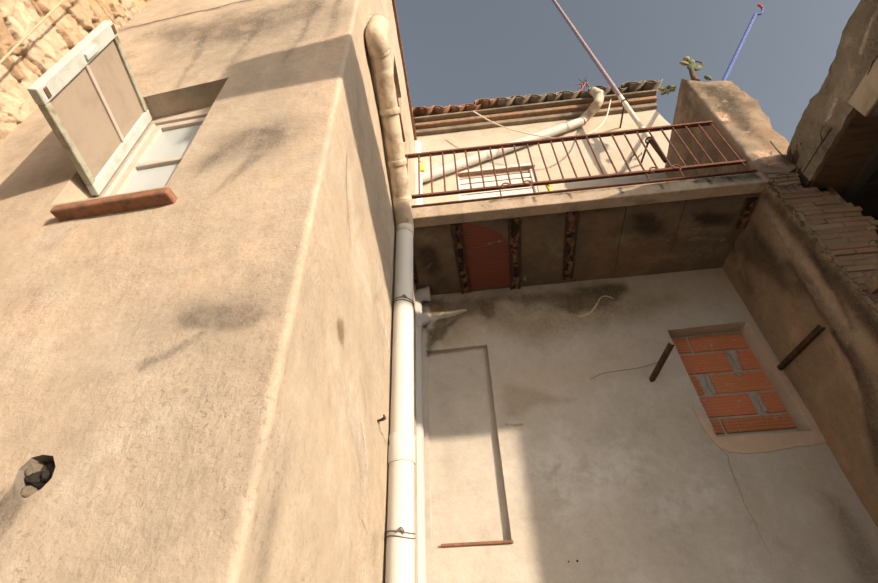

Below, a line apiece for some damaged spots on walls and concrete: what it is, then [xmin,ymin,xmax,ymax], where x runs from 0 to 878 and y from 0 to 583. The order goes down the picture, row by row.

water stain [428,299,494,350]
peeling [692,322,826,454]
water stain [765,194,878,463]
hole [20,462,56,498]